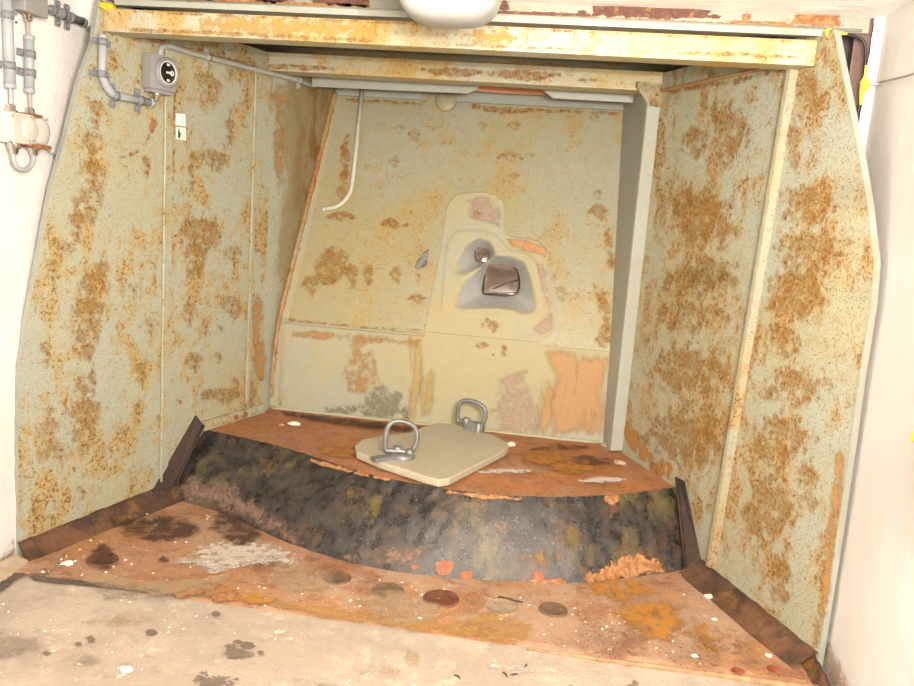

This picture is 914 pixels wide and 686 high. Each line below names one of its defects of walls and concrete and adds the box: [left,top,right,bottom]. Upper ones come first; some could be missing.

corrosion [201,0,371,8]
corrosion [167,11,417,43]
corrosion [624,185,738,479]
corrosion [283,412,423,431]
corrosion [177,476,298,545]
corrosion [119,516,199,541]
corrosion [814,453,844,645]
corrosion [69,544,531,643]
corrosion [567,552,722,670]
damp [0,636,50,658]
damp [222,640,264,659]
damp [194,670,239,686]